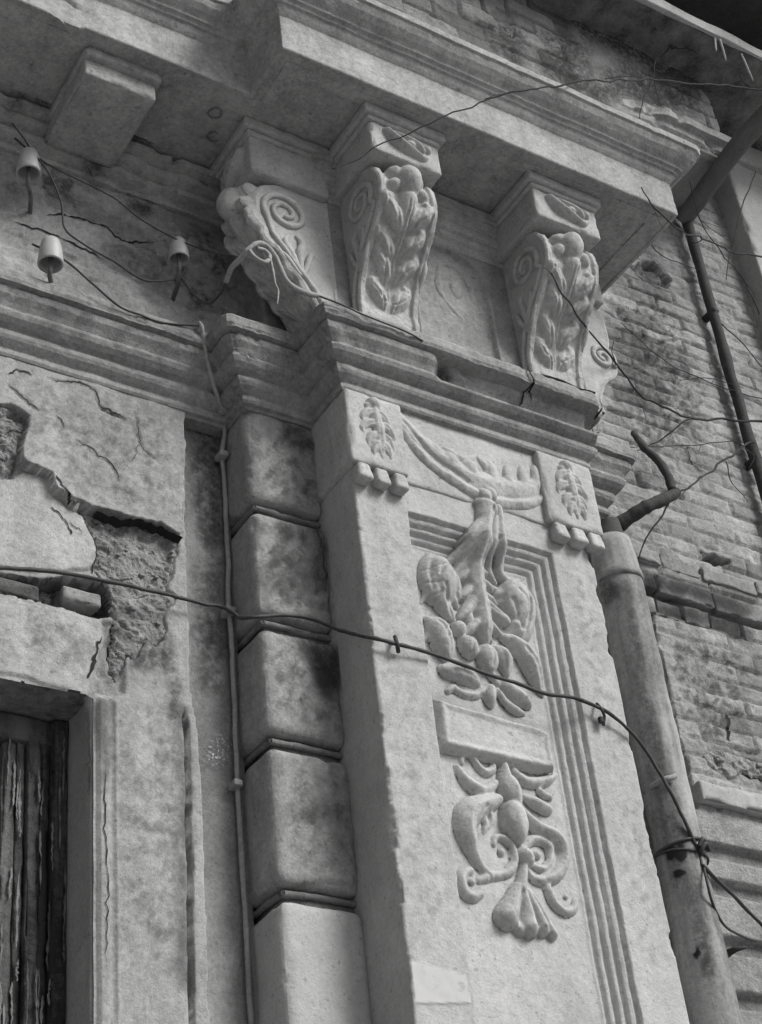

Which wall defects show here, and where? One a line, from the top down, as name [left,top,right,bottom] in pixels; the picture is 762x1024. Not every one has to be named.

crack [17,213,158,259]
spalling [0,407,24,480]
crack [9,369,153,478]
crack [519,366,603,433]
spalling [39,590,59,606]
spalling [78,512,177,683]
damp [302,639,340,693]
crack [86,638,110,960]